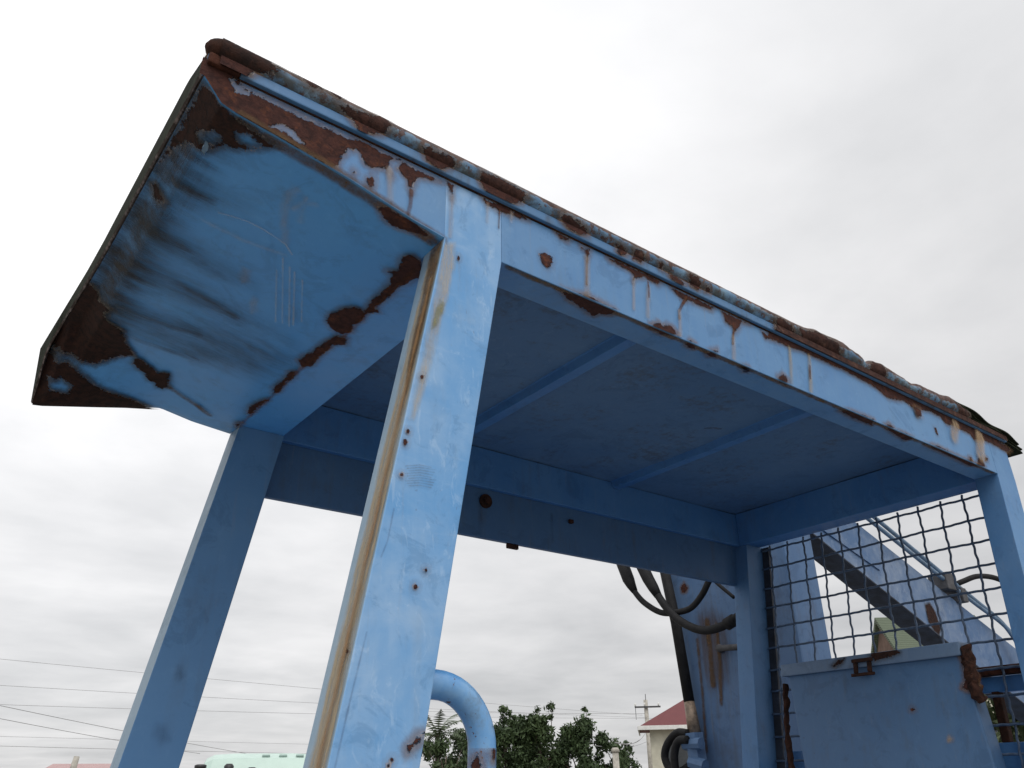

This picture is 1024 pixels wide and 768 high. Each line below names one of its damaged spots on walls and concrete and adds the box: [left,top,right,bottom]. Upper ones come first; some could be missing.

corrosion [478,168,530,228]
corrosion [32,282,211,416]
corrosion [159,38,460,768]
corrosion [507,210,1011,474]
corrosion [696,618,723,753]